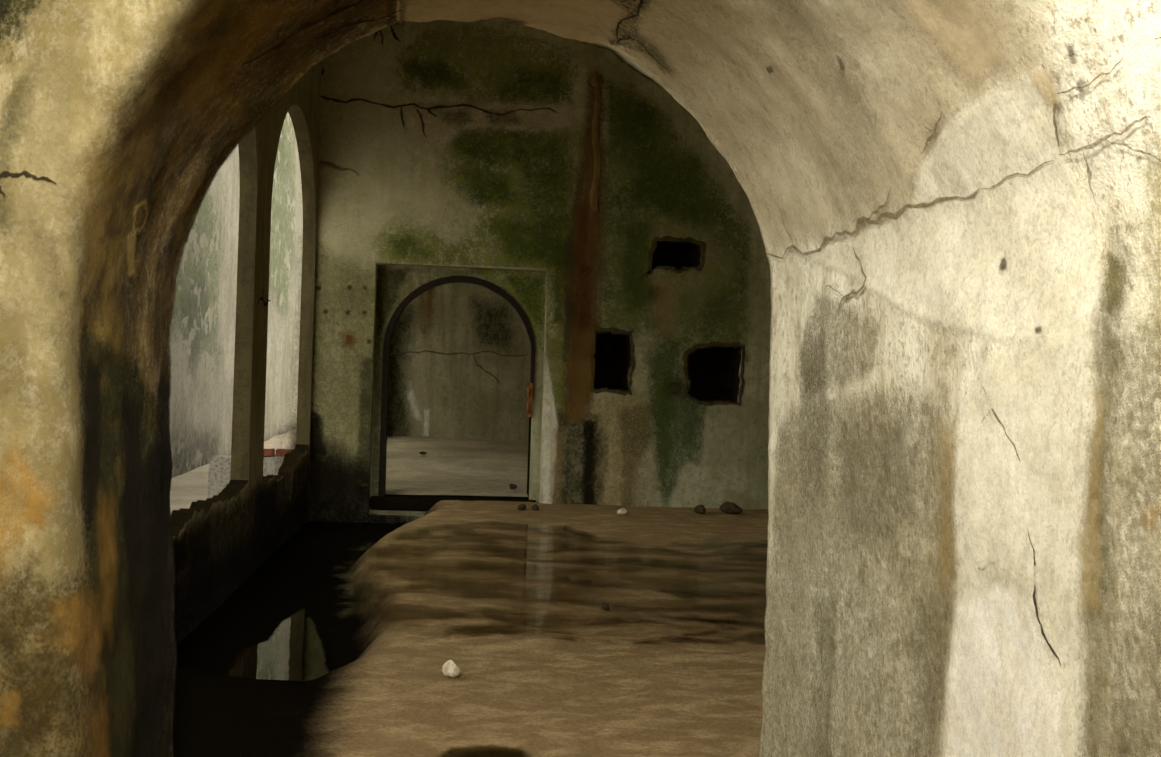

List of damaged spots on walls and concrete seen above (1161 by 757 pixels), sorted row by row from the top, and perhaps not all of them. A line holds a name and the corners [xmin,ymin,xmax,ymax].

crack [582,0,670,90]
crack [321,67,558,138]
crack [0,170,57,198]
crack [769,57,1161,313]
rust [563,73,603,422]
spalling [640,236,706,277]
water stain [1103,250,1122,315]
water stain [0,0,475,757]
water stain [540,355,605,505]
spalling [589,326,636,396]
water stain [618,340,704,506]
spalling [683,342,746,407]